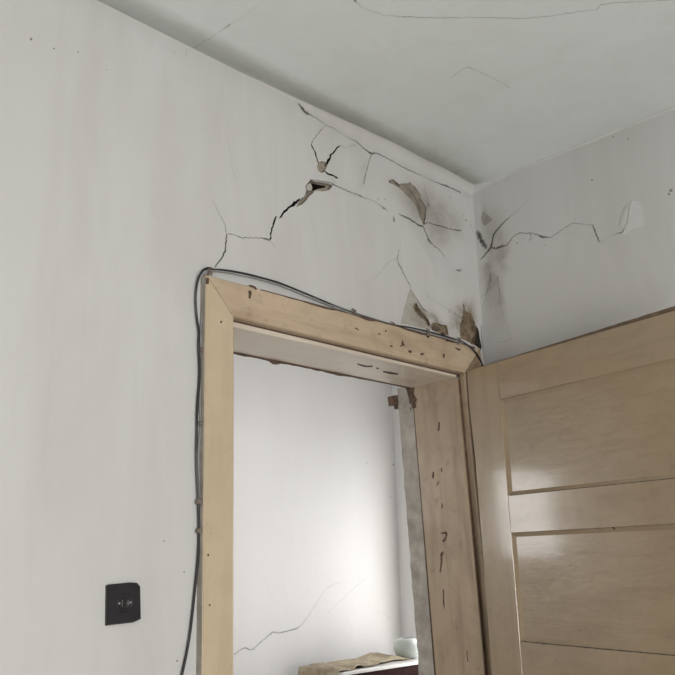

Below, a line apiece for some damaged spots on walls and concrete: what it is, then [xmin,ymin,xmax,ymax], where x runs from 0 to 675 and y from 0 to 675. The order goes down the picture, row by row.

crack [298,103,420,197]
crack [215,199,300,267]
spalling [297,176,335,206]
flaking render [388,179,426,224]
crack [481,219,513,259]
flaking render [247,285,482,351]